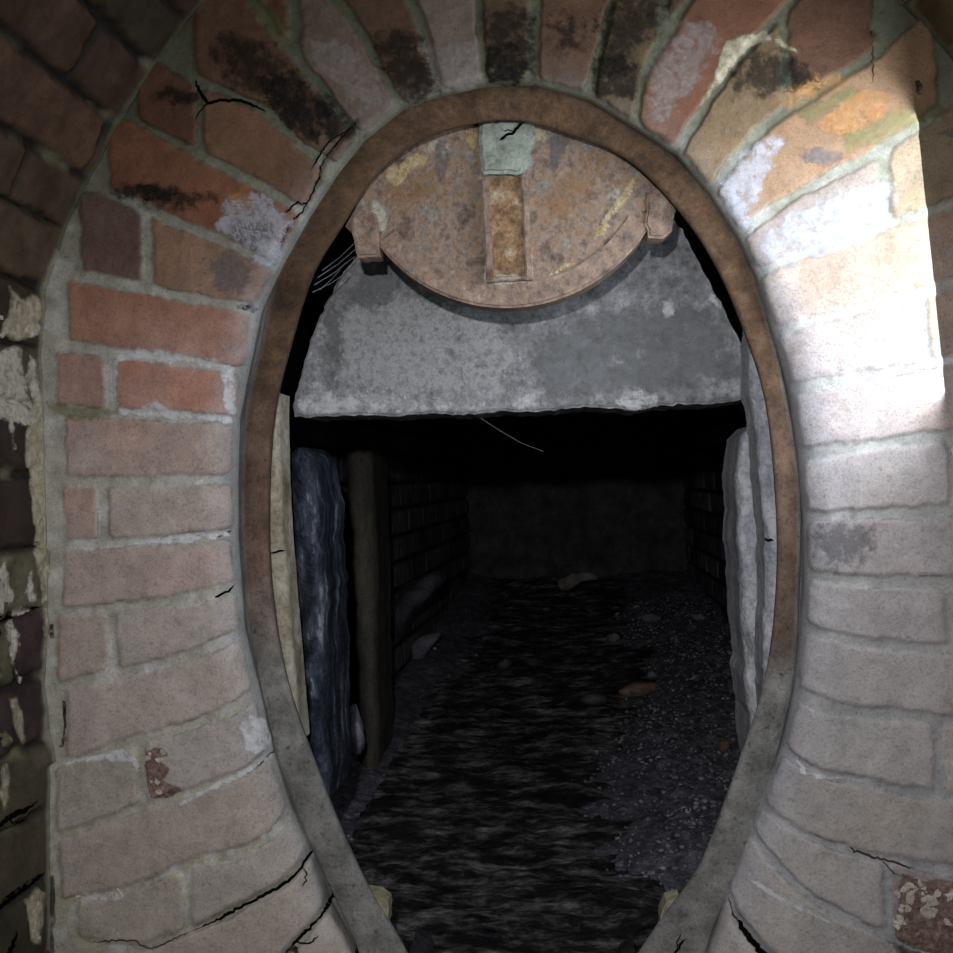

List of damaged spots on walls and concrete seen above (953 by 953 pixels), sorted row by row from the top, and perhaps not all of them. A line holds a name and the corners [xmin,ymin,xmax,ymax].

crack [195,80,266,118]
water stain [261,71,332,145]
water stain [593,54,637,99]
water stain [706,31,797,99]
crack [277,122,356,249]
water stain [216,192,293,266]
peeling [0,292,42,432]
spalling [144,747,182,798]
crack [850,847,913,876]
crack [85,849,334,953]
crack [728,899,767,953]
spalling [891,874,953,953]